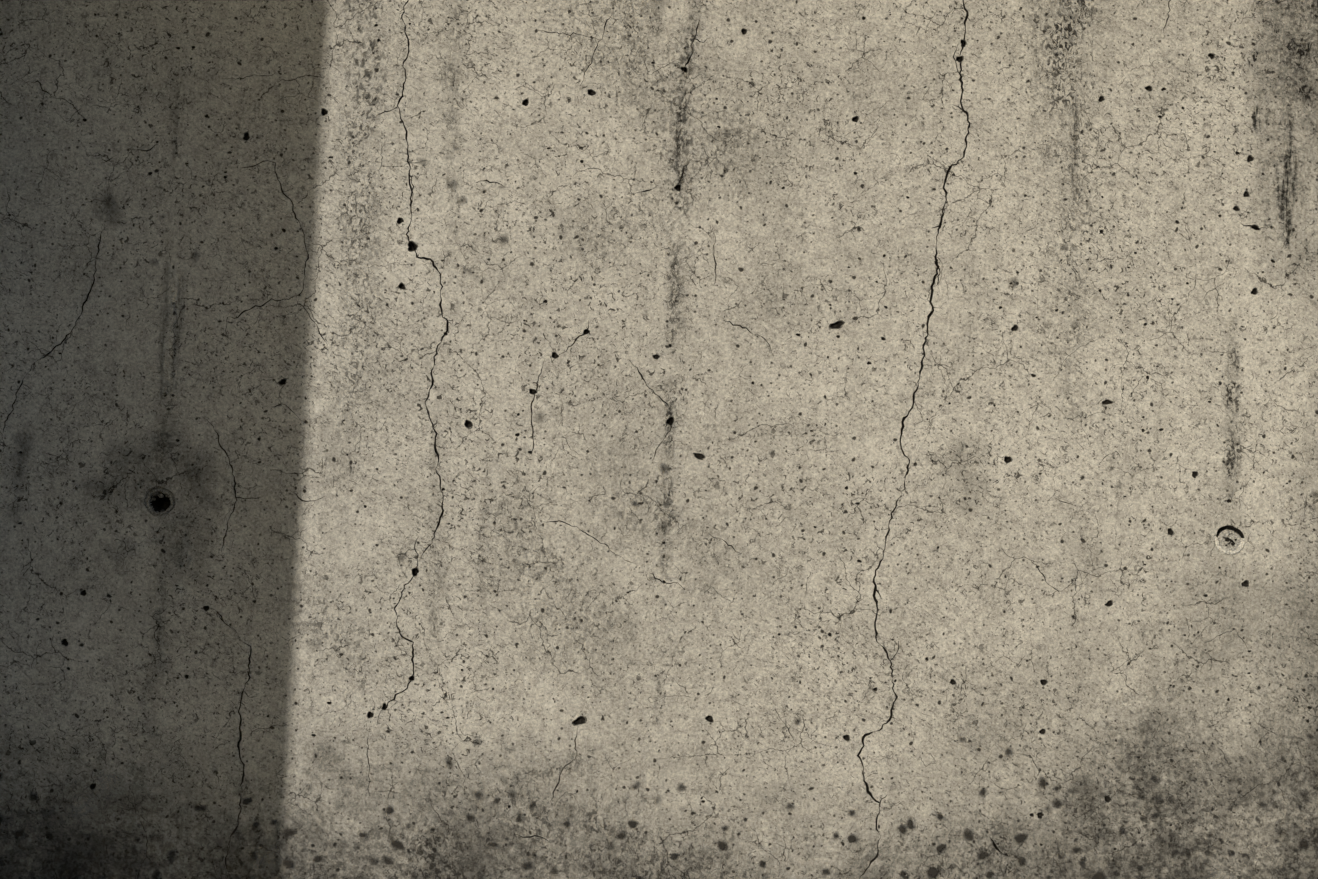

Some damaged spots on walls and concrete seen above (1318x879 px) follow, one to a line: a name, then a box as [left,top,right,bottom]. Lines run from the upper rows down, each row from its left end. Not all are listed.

crack [366,0,449,796]
crack [857,0,970,879]
damp [371,814,502,879]
damp [587,817,690,879]
damp [670,826,728,873]
damp [979,727,1318,879]